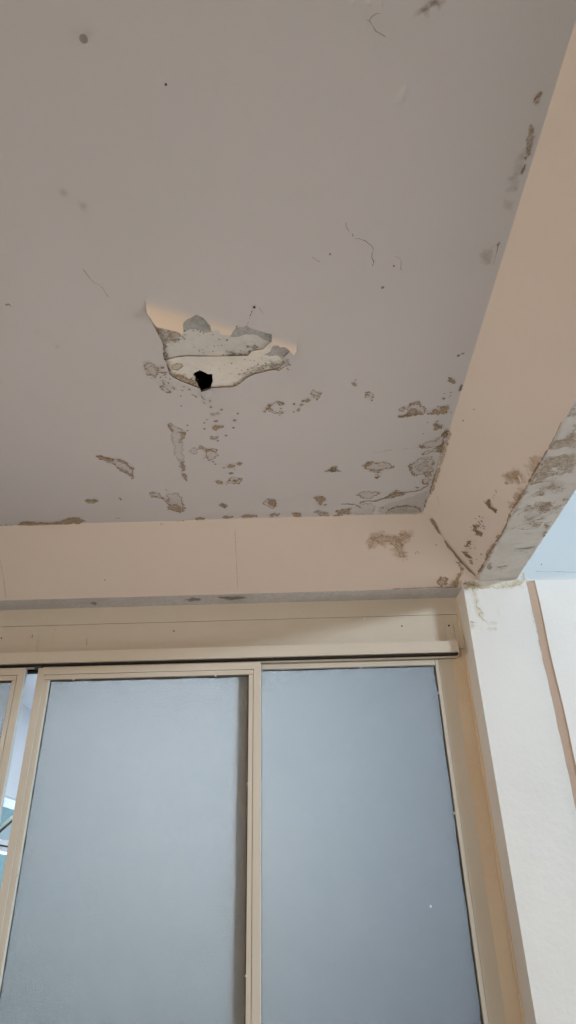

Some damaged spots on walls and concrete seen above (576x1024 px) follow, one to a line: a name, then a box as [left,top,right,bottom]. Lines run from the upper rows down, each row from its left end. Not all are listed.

peeling [159,367,213,403]
peeling [0,518,85,526]
crack [398,423,561,589]